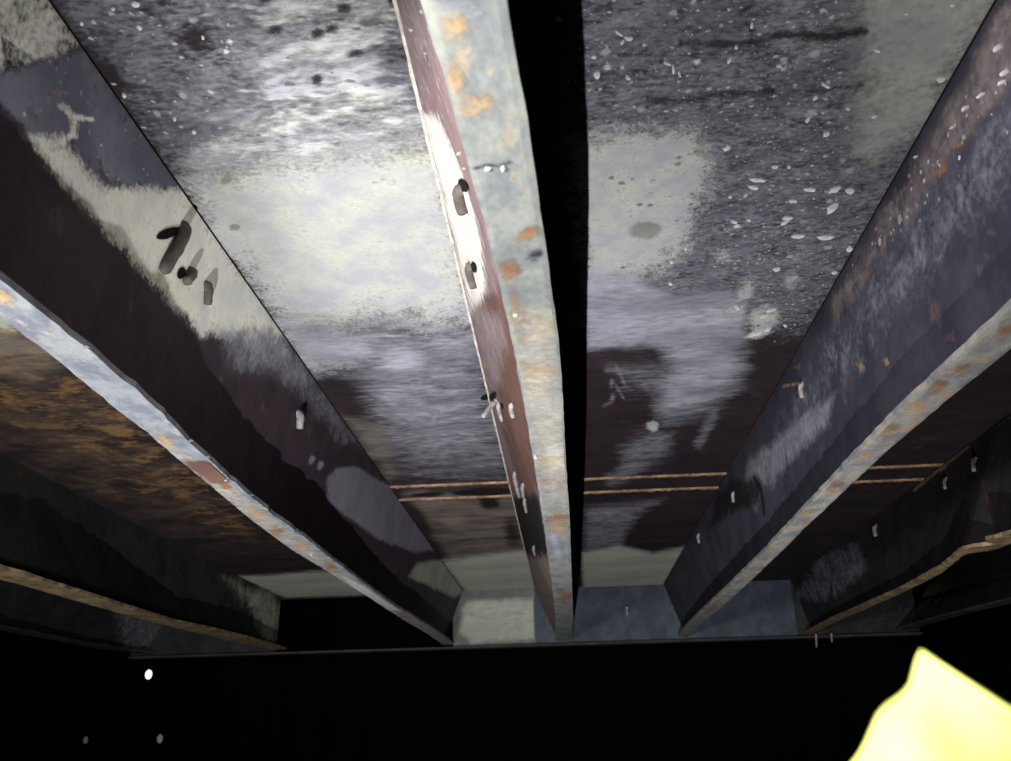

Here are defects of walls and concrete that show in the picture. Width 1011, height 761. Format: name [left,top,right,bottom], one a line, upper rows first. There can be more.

crack [655,88,774,103]
crack [679,22,868,48]
leakage [0,0,506,466]
rust [519,228,538,240]
efflorescence [560,0,1011,476]
rust [0,331,346,582]
efflorescence [513,311,565,495]